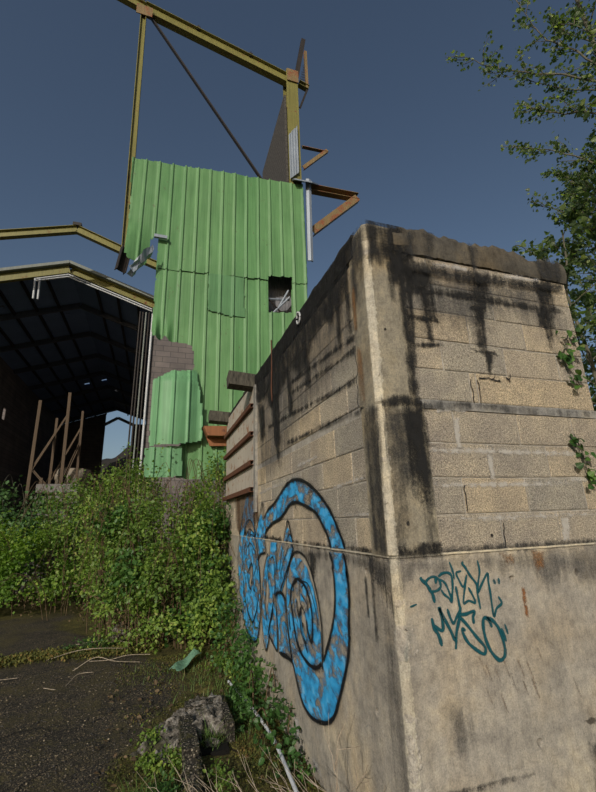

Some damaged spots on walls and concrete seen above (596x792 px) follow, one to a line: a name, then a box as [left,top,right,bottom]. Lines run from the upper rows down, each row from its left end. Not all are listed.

water stain [235,220,562,637]
water stain [399,539,595,558]